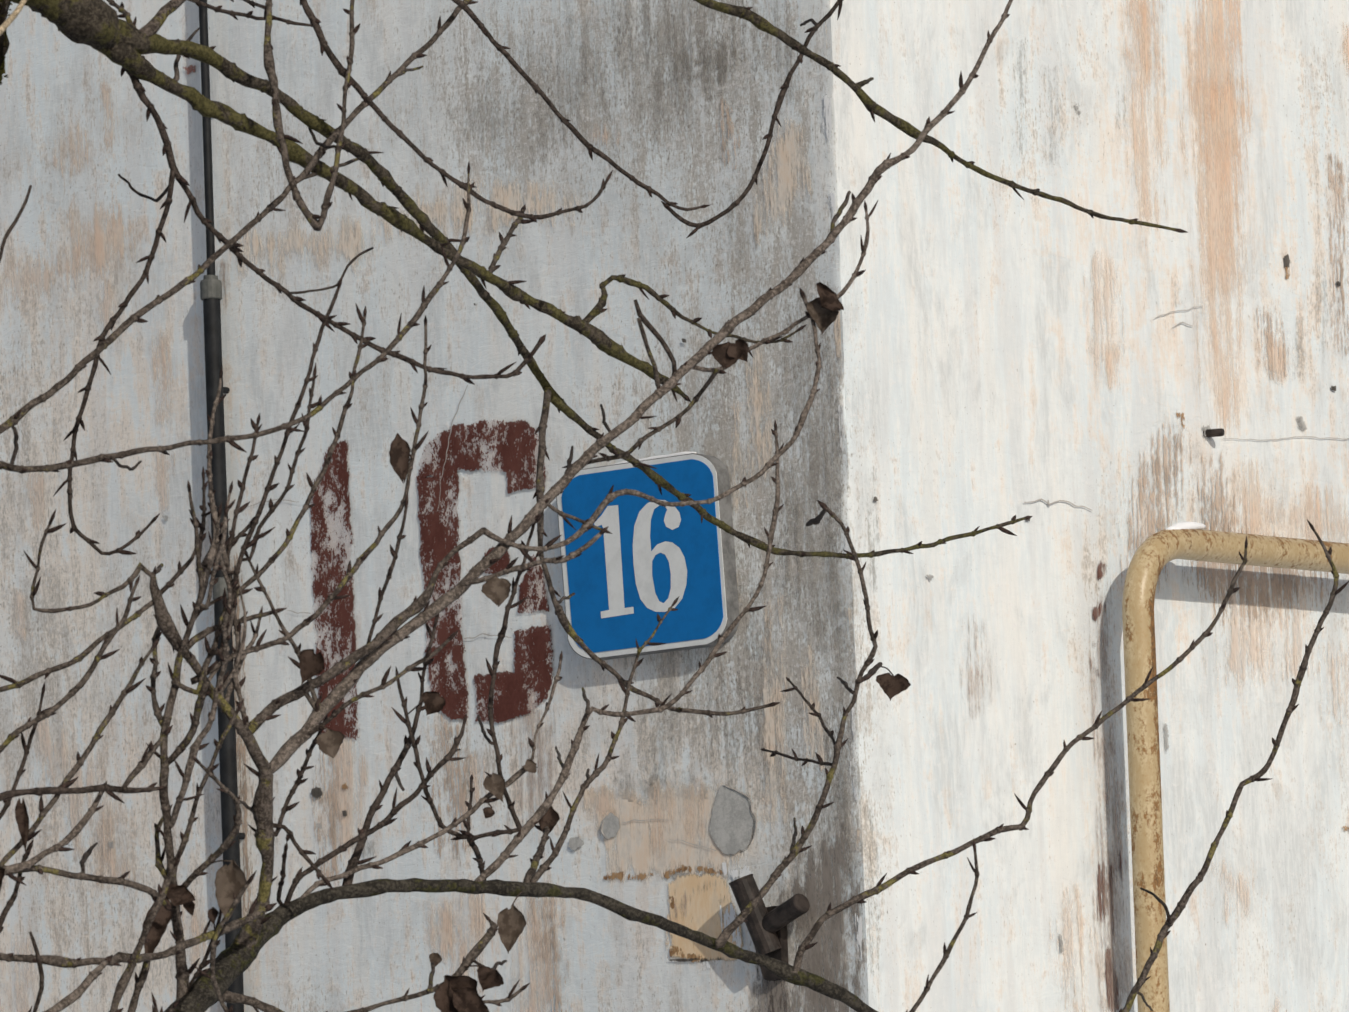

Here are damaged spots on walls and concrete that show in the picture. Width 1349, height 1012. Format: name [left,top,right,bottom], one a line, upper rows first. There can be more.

peeling [753,121,811,240]
peeling [1084,254,1125,387]
peeling [1118,0,1348,578]
peeling [731,345,772,508]
peeling [1184,561,1348,725]
spalling [568,837,584,851]
peeling [584,596,826,969]
corrosion [1097,853,1122,1012]